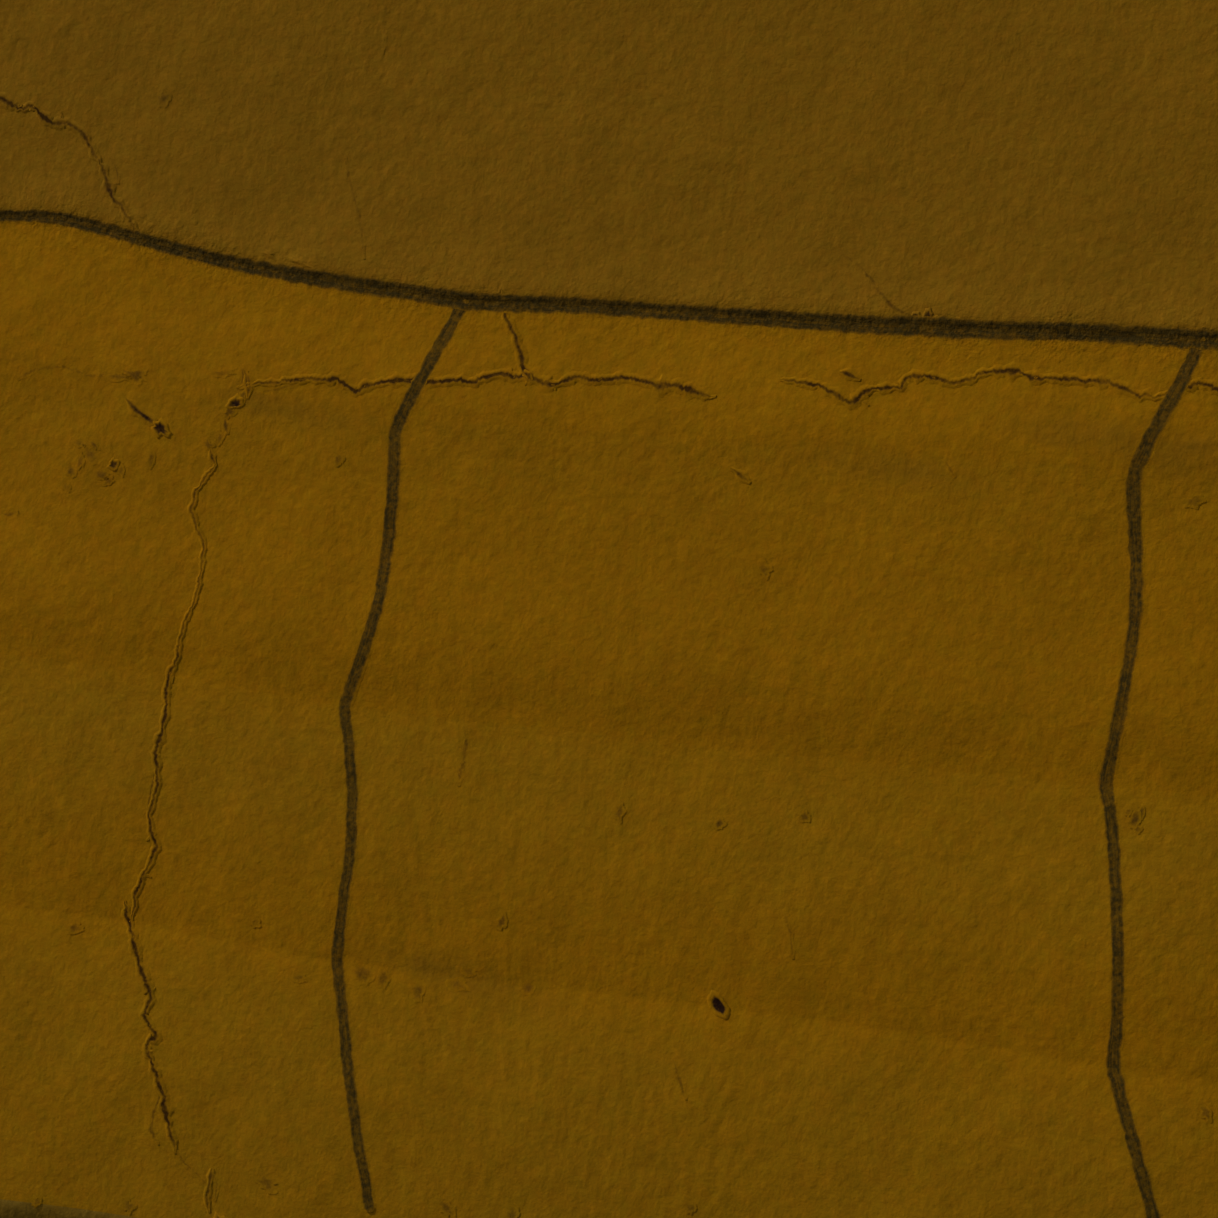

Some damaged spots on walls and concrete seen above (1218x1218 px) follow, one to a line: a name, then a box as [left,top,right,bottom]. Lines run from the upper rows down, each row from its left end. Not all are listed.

crack [0,91,139,230]
crack [237,289,716,402]
crack [779,360,1218,411]
crack [120,464,220,1213]